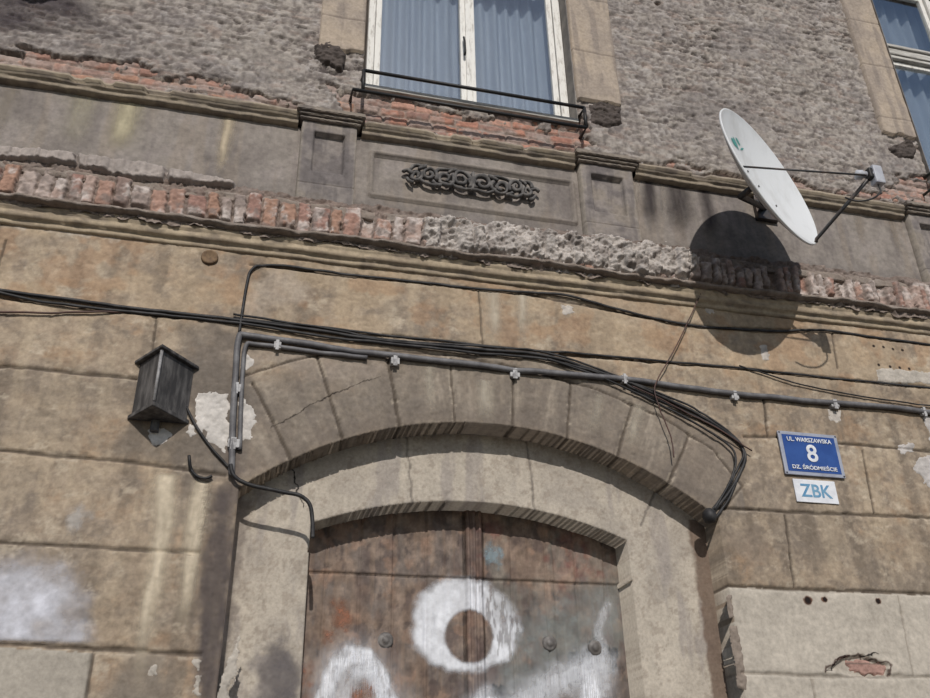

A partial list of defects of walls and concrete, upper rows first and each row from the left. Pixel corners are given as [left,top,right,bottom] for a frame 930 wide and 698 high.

spalling [314,42,346,73]
flaking render [0,51,298,109]
spalling [888,140,916,159]
flaking render [148,428,172,446]
flaking render [186,391,257,453]
flaking render [828,409,841,423]
flaking render [898,443,930,488]
flaking render [825,653,891,677]